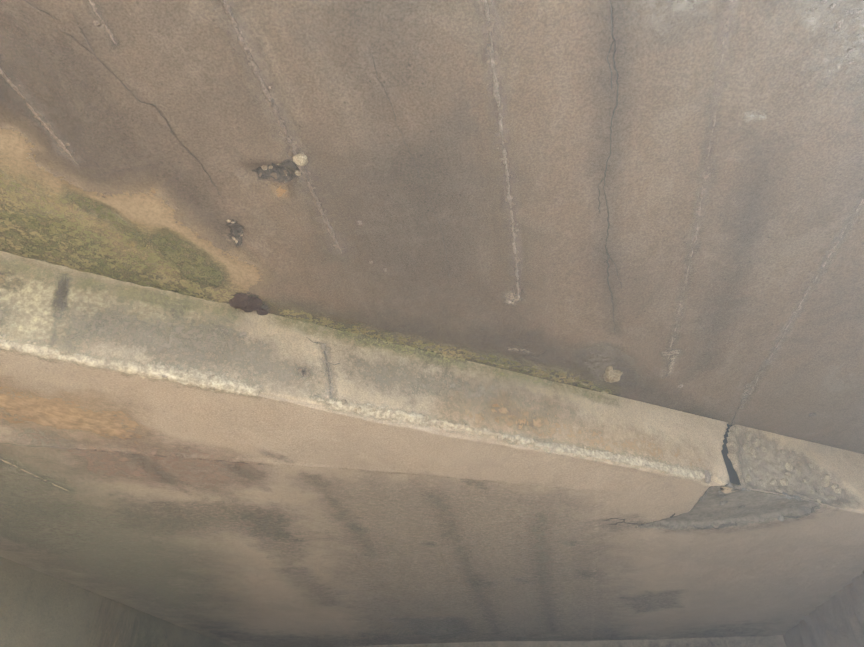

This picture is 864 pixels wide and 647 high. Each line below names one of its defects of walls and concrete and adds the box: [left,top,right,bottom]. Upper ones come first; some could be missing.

crack [24,0,223,198]
peeling [0,127,263,304]
spalling [252,160,301,183]
crack [597,0,622,335]
water stain [0,268,213,341]
spalling [0,335,262,397]
peeling [315,397,819,529]
crack [694,386,751,530]